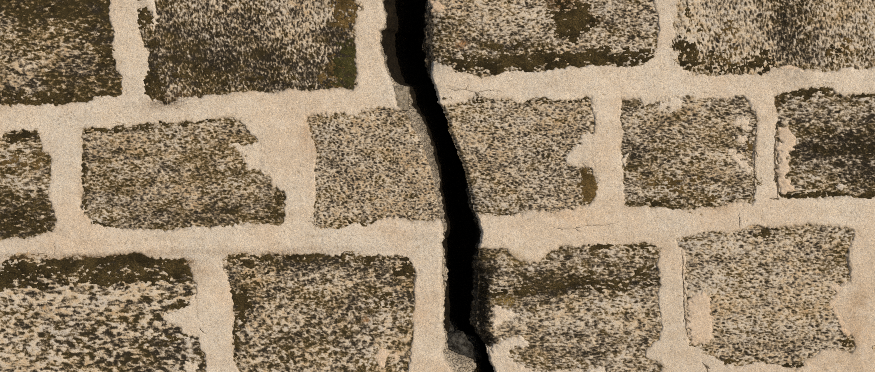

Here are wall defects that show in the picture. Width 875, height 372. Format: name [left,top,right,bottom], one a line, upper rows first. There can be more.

crack [379,0,498,372]